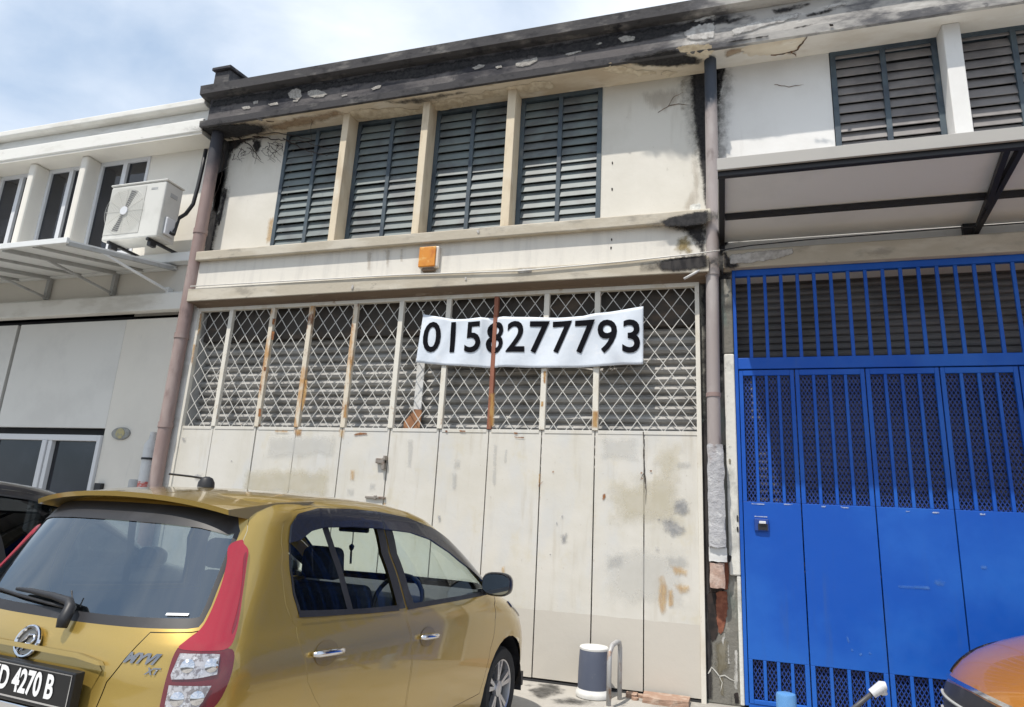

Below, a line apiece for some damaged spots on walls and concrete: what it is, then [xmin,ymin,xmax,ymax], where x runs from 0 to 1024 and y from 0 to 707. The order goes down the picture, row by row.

peeling [516,57,538,67]
peeling [597,62,677,77]
peeling [676,15,715,56]
peeling [732,13,801,35]
crack [771,37,807,56]
leakage [202,111,340,251]
leakage [625,35,768,393]
spalling [707,557,729,641]